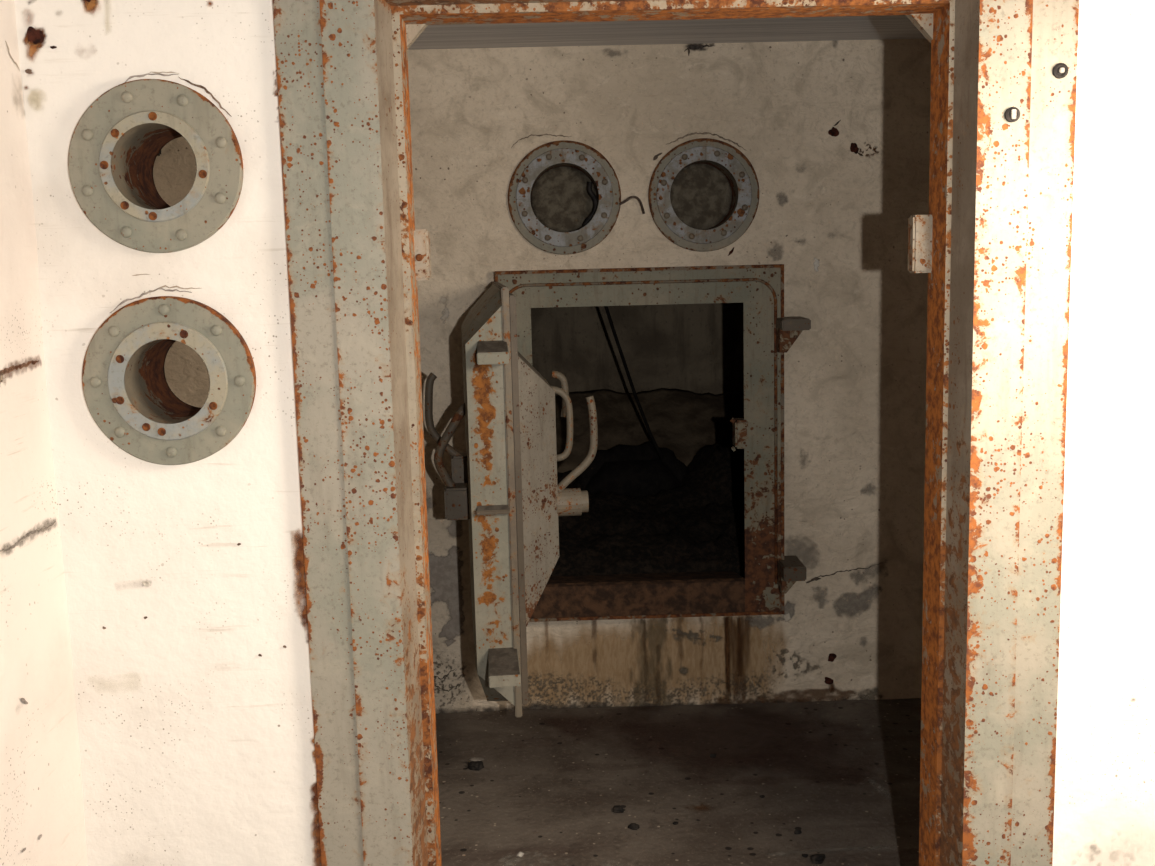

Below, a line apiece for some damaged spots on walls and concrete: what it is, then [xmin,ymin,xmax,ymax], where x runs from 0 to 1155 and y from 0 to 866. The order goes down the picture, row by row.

corrosion [294,533,309,642]
crack [806,562,886,583]
leakage [527,617,781,706]
corrosion [311,782,322,866]